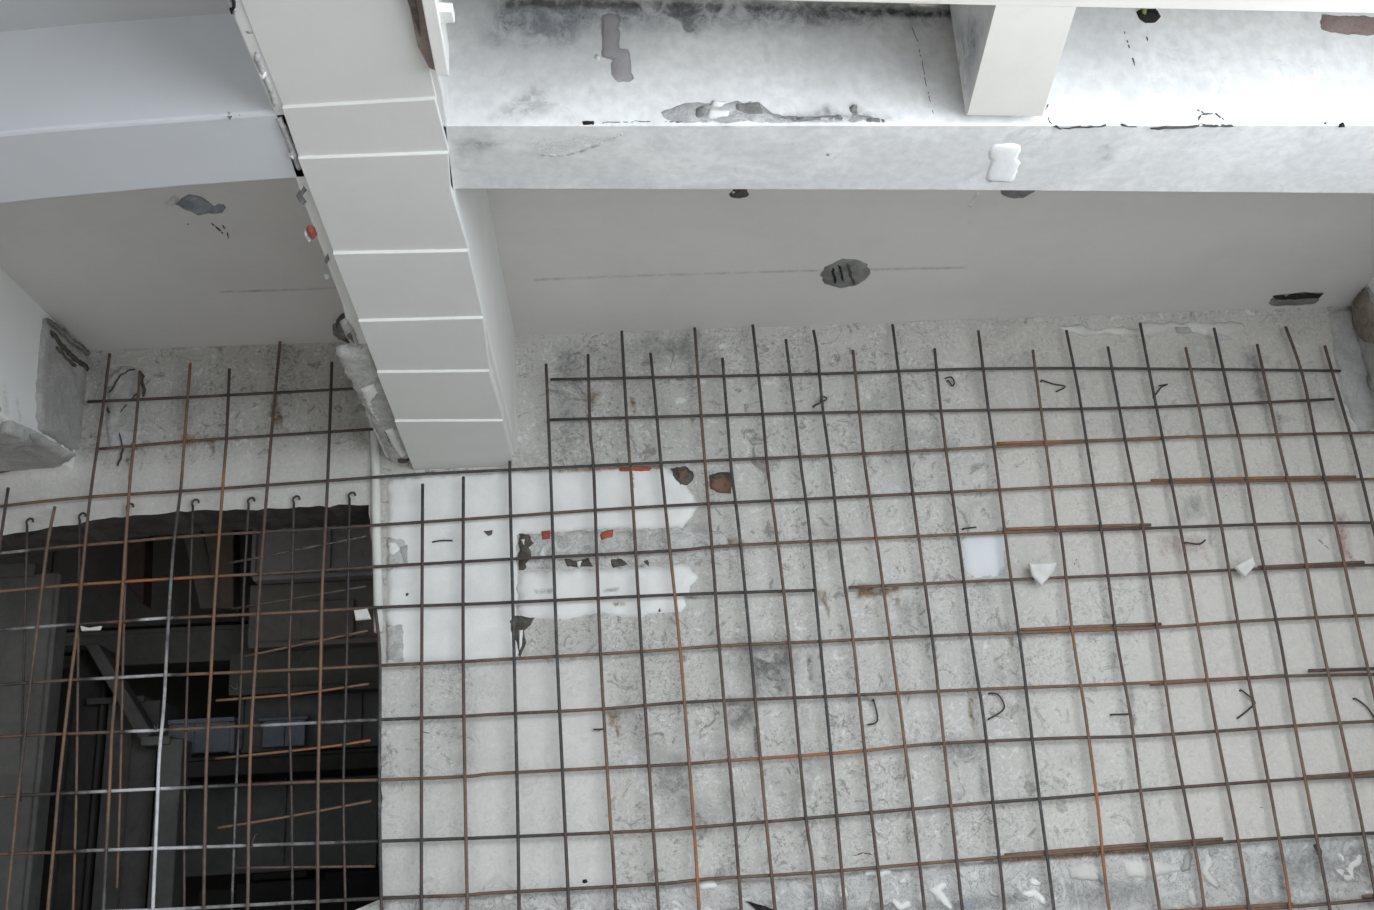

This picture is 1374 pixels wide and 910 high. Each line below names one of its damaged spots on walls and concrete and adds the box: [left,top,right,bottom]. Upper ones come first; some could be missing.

water stain [800,8,951,17]
peeling [1320,14,1374,36]
peeling [594,13,634,82]
peeling [661,100,885,127]
spalling [165,194,229,238]